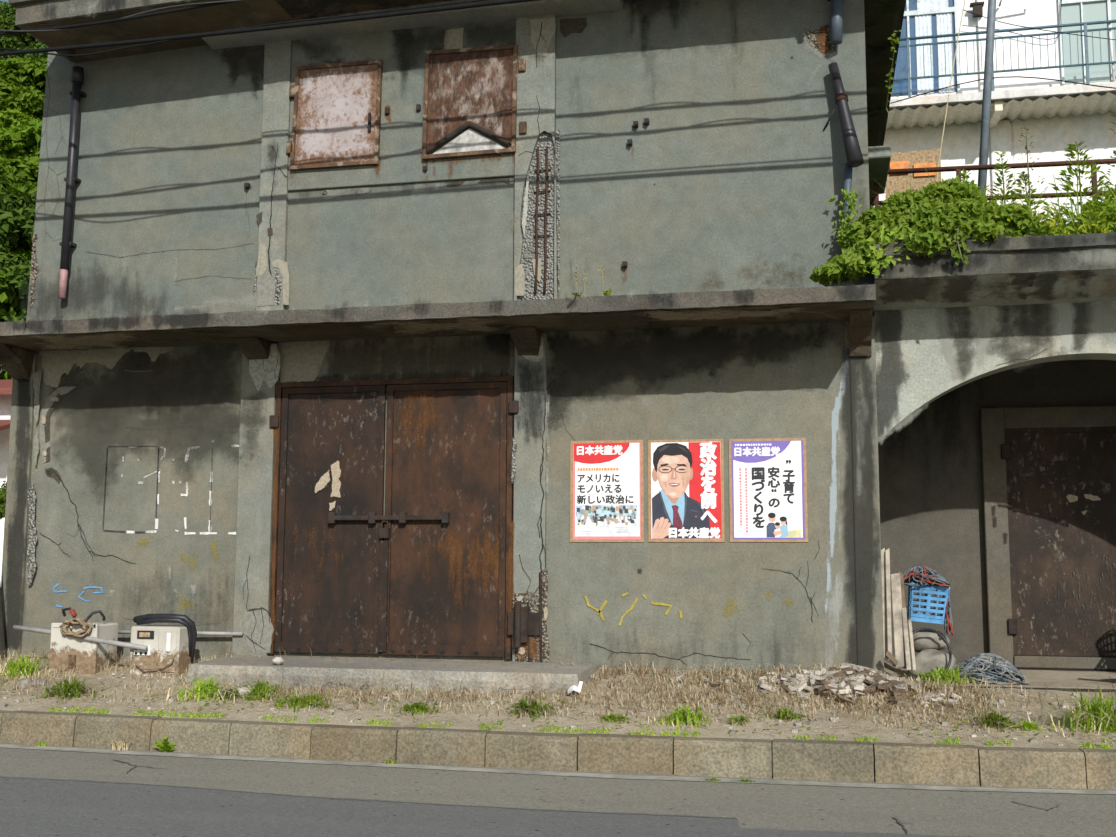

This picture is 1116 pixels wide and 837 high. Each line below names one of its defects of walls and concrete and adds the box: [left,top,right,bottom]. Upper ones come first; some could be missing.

peeling [446,177,510,187]
spalling [515,130,560,300]
peeling [32,347,173,465]
water stain [13,310,261,481]
peeling [27,481,37,586]
crack [39,472,136,564]
corrosion [438,522,514,612]